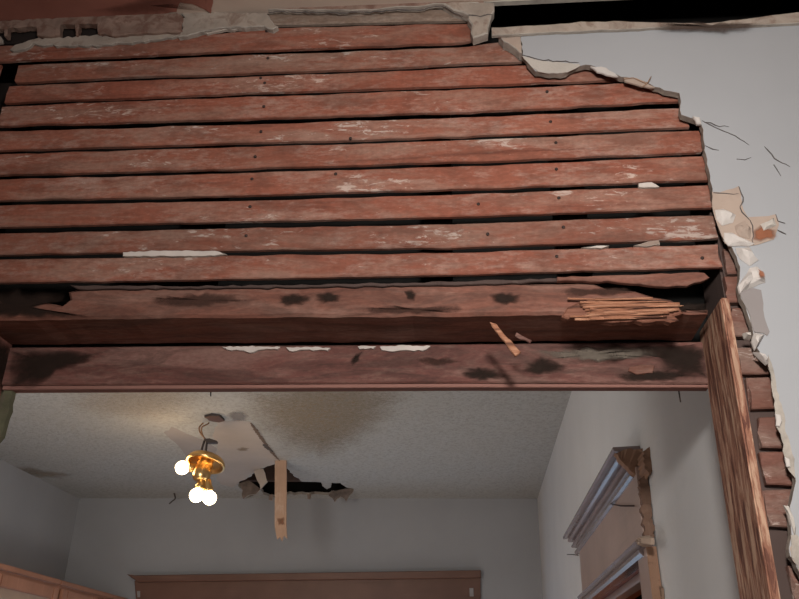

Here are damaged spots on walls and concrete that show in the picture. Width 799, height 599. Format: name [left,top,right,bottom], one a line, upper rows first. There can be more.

flaking render [522,55,580,74]
crack [702,120,790,176]
flaking render [712,186,785,247]
flaking render [123,250,228,258]
water stain [282,294,308,305]
water stain [372,291,459,313]
water stain [493,293,517,304]
peeling [222,346,331,354]
water stain [465,368,500,380]
water stain [528,358,562,374]
peeling [739,288,795,478]
spalling [287,482,348,493]